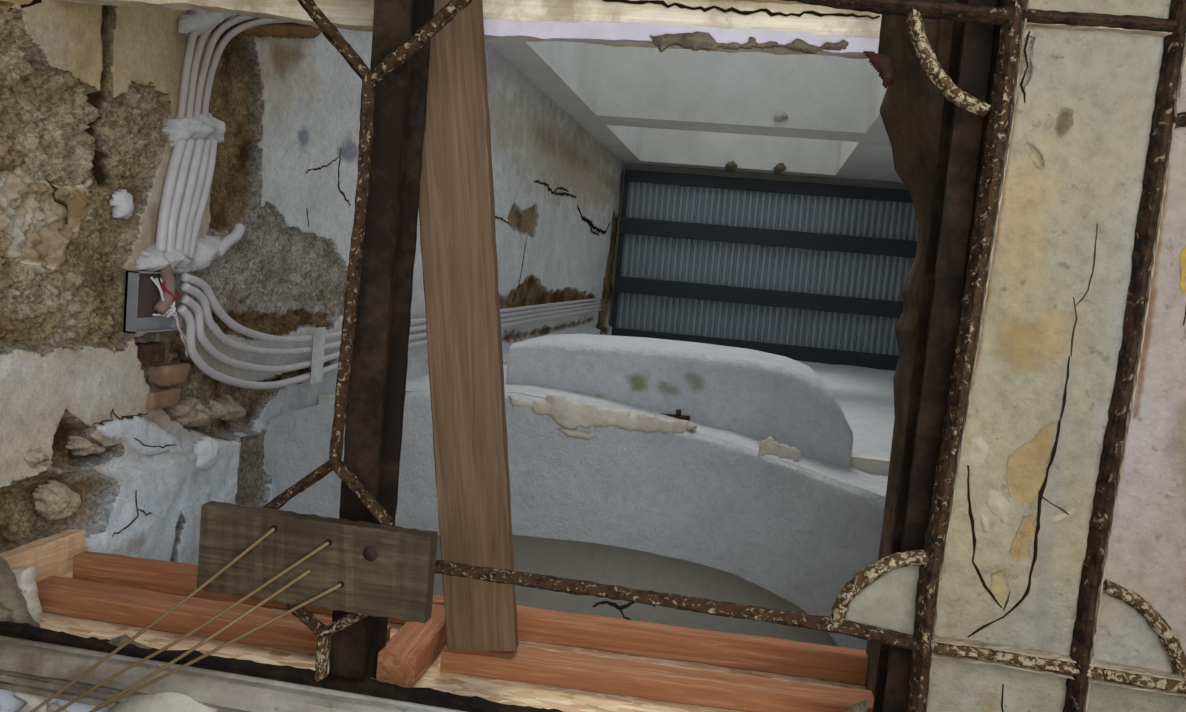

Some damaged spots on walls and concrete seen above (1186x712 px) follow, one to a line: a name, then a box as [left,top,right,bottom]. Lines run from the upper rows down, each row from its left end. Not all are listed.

crack [603,0,880,19]
spalling [650,31,849,54]
spalling [863,51,896,88]
spalling [0,0,348,507]
crack [305,148,351,206]
spalling [499,211,619,343]
crack [534,179,610,236]
spalling [0,409,125,553]
peeling [991,419,1061,606]
crack [967,224,1098,638]